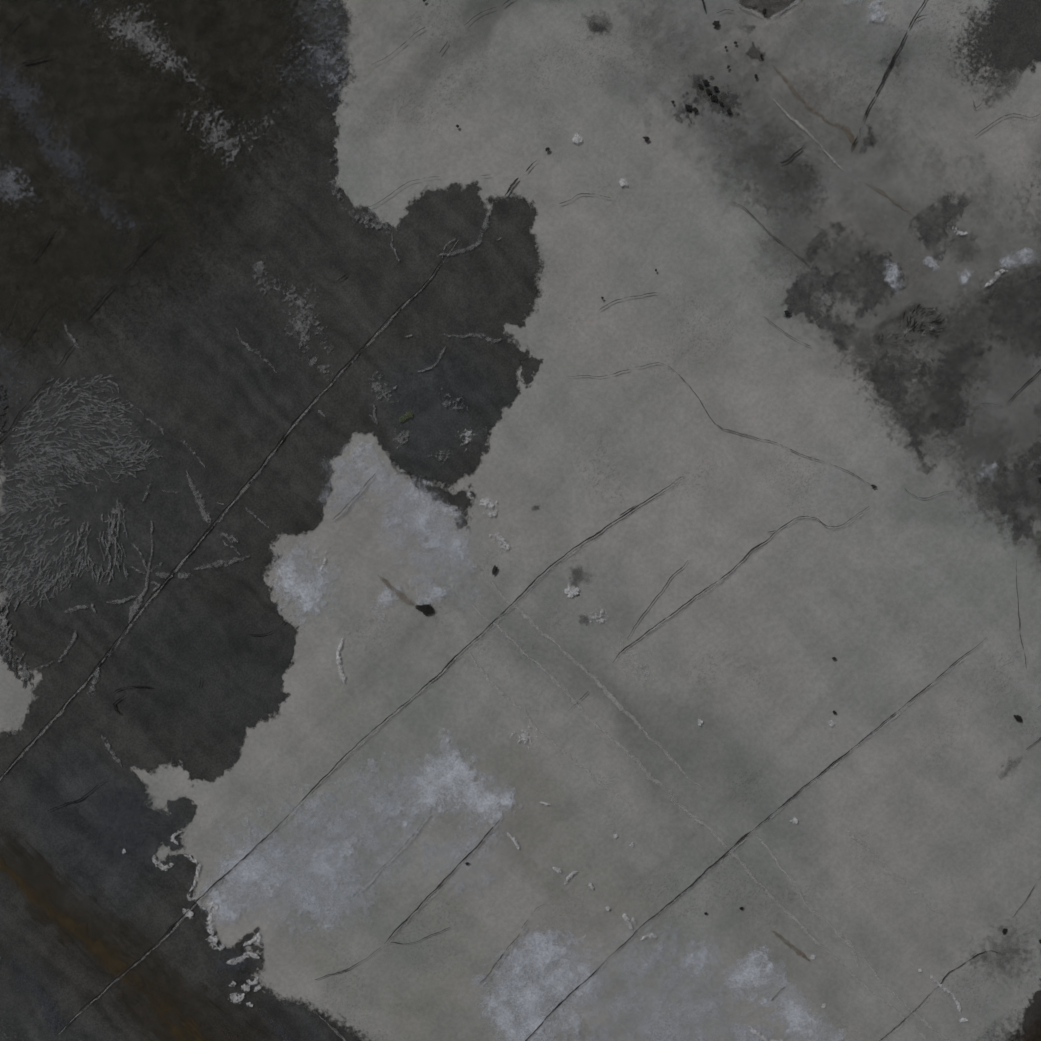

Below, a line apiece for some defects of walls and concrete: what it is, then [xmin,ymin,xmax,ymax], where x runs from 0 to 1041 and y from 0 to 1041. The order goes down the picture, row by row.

crack [481,149,551,195]
crack [851,0,926,148]
damp [913,195,974,266]
damp [954,0,1041,107]
crack [0,236,455,777]
damp [0,0,543,1041]
crack [571,362,872,662]
damp [785,249,1041,541]
crack [57,476,683,1034]
crack [525,638,998,1041]
damp [483,933,596,1041]
efflorescence [727,947,818,1041]